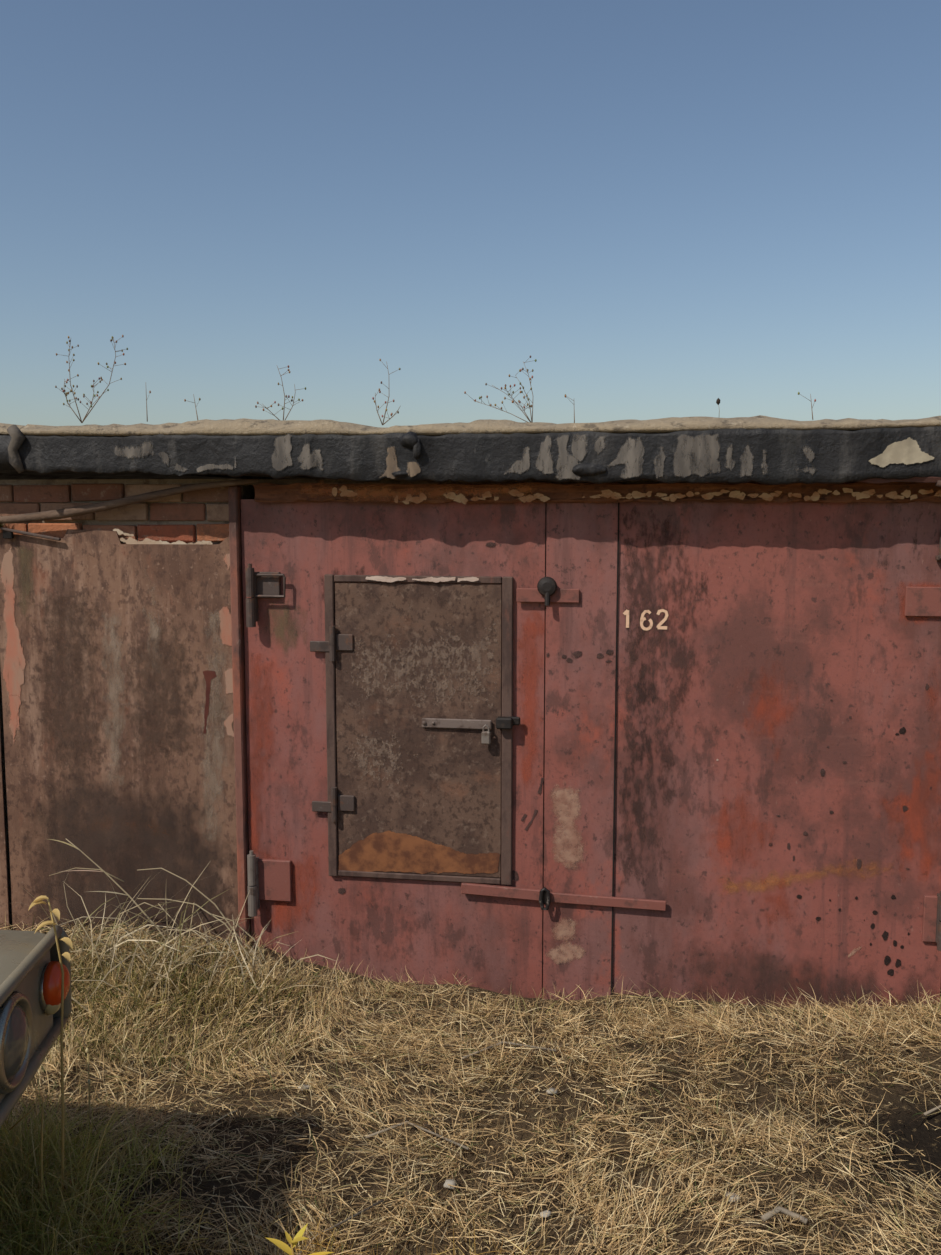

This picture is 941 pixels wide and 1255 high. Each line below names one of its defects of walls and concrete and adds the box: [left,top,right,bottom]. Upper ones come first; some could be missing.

peeling [159,452,236,472]
peeling [272,434,323,471]
peeling [379,446,421,479]
peeling [504,435,581,480]
peeling [803,447,815,474]
spalling [869,437,934,467]
water stain [36,597,225,939]